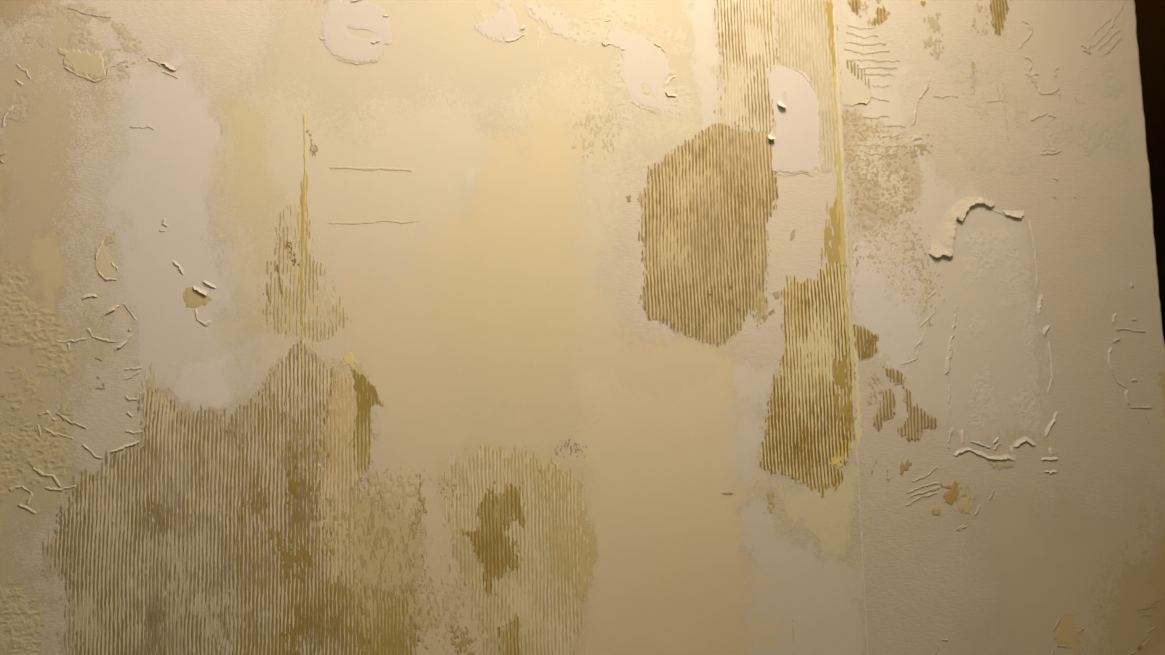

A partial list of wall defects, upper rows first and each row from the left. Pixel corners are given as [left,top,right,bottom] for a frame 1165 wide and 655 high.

peeling [320,0,392,65]
peeling [766,65,821,177]
peeling [929,196,1024,258]
peeling [183,280,217,308]
peeling [953,411,1058,474]